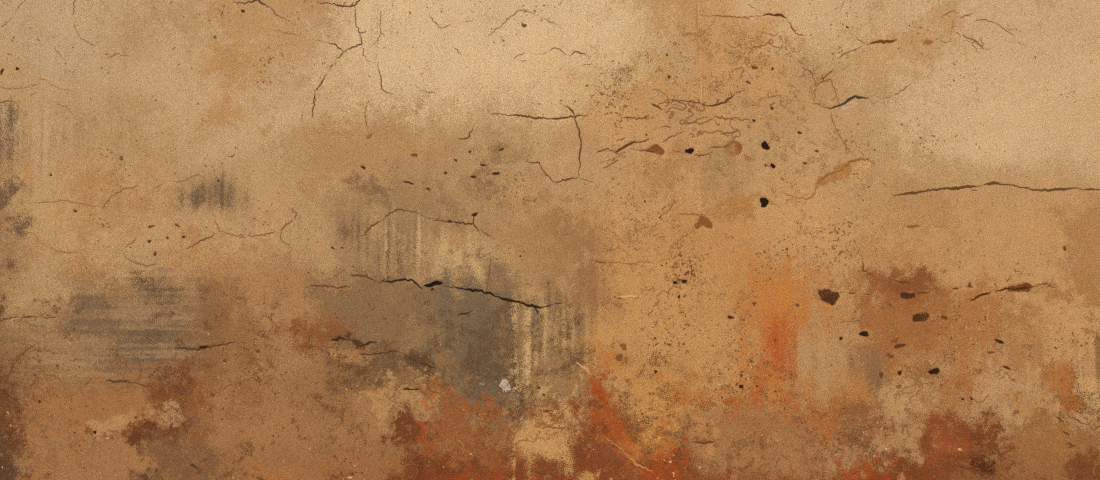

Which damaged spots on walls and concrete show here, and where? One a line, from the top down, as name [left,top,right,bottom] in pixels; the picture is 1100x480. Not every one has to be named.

crack [219,0,437,127]
crack [429,5,602,65]
crack [495,4,909,200]
crack [309,209,560,316]
crack [590,197,703,310]
crack [840,248,930,295]
crack [893,181,1100,228]
crack [970,283,1054,300]
crack [0,313,236,419]
corrosion [79,238,1100,480]
crack [294,324,952,480]
crack [933,362,1100,480]